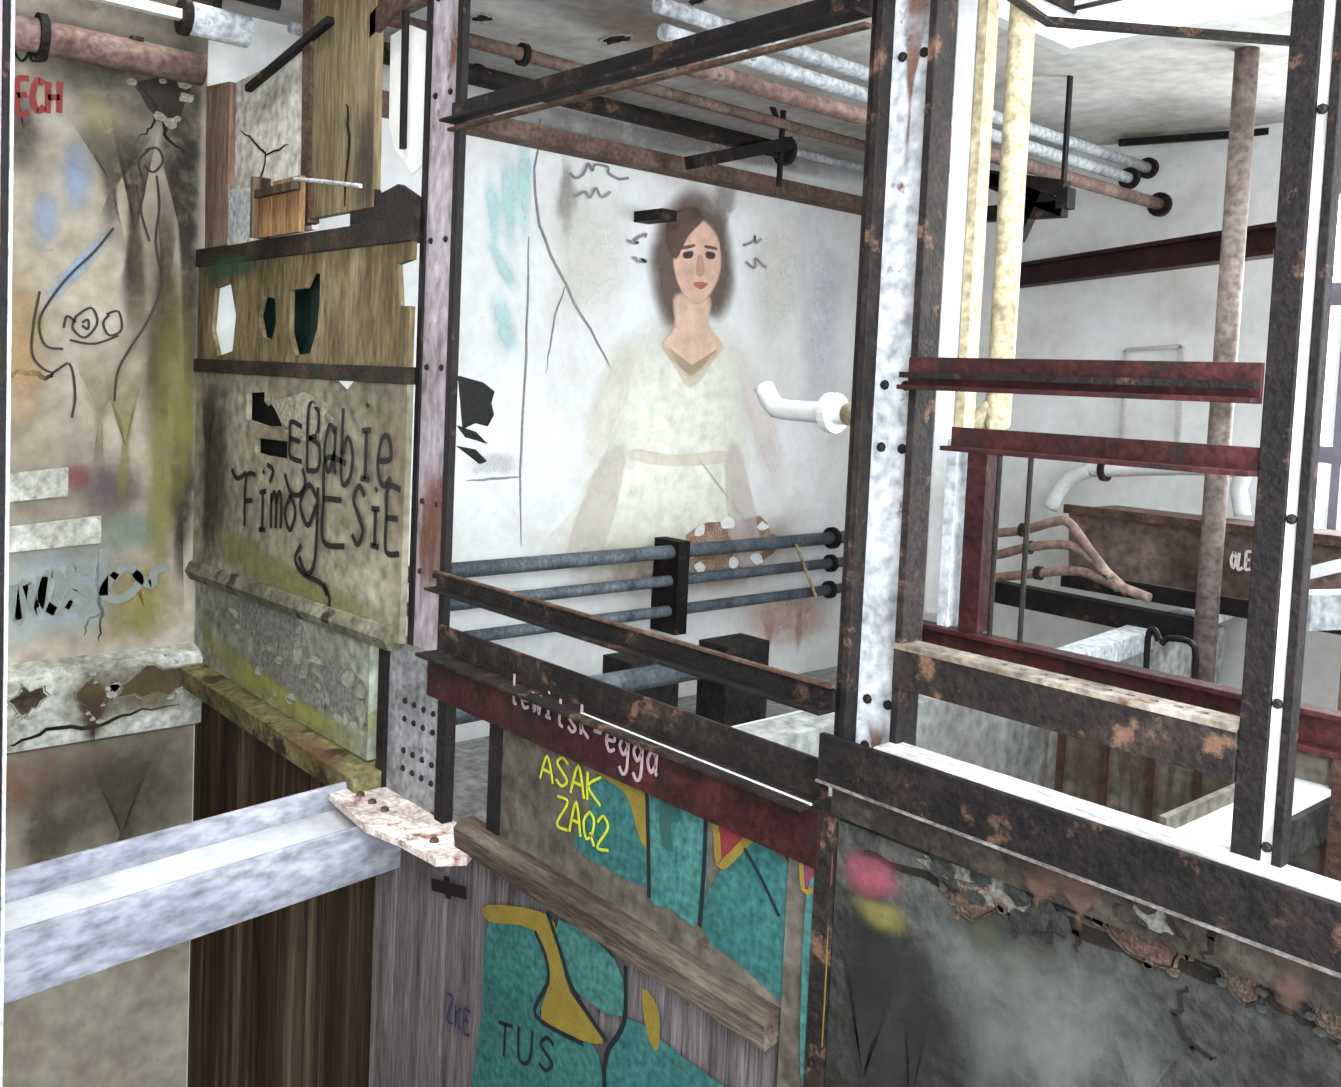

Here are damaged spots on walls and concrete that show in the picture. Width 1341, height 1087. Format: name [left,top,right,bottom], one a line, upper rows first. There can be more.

leakage [94,82,224,570]
spalling [7,684,51,720]
spalling [74,661,199,724]
rust [1041,743,1201,820]
peeling [916,853,1072,939]
rust [1029,872,1097,921]
peeling [1090,889,1195,978]
spalling [1215,968,1270,1014]